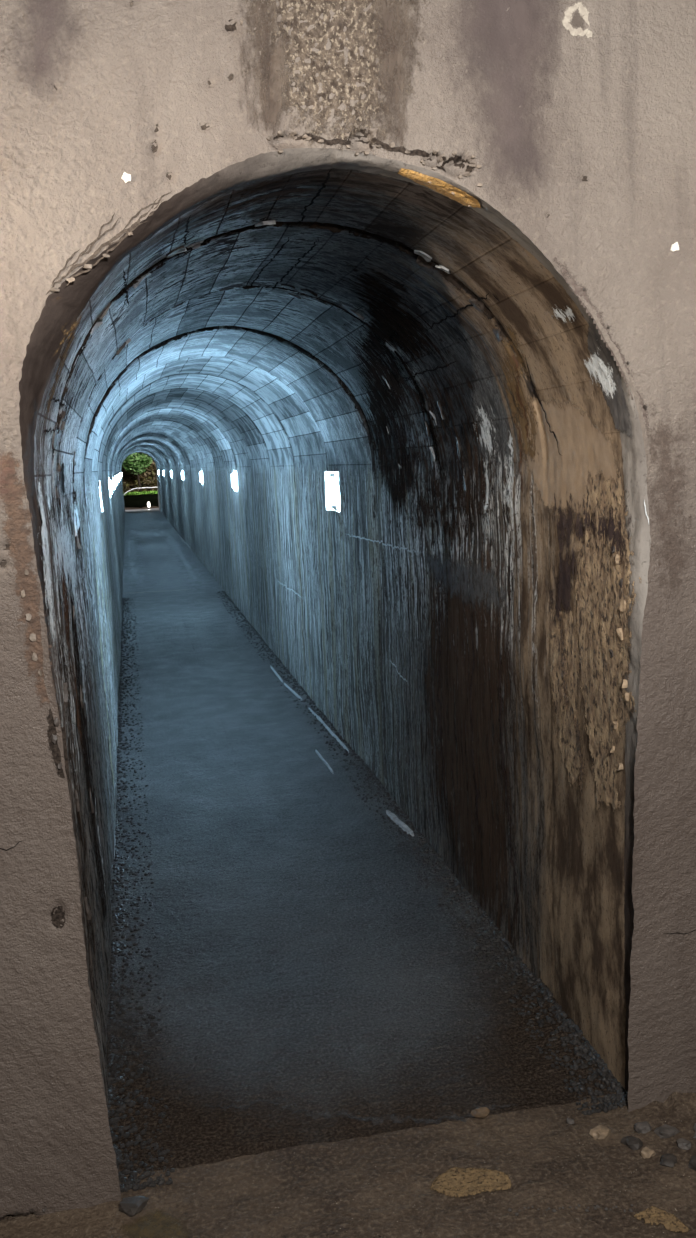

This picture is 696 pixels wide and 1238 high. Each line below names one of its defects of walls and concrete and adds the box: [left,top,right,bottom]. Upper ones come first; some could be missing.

peeling [50,220,512,565]
damp [550,306,574,323]
damp [584,316,632,438]
damp [37,479,80,648]
damp [409,398,539,958]
damp [549,544,580,626]
spalling [517,398,642,817]